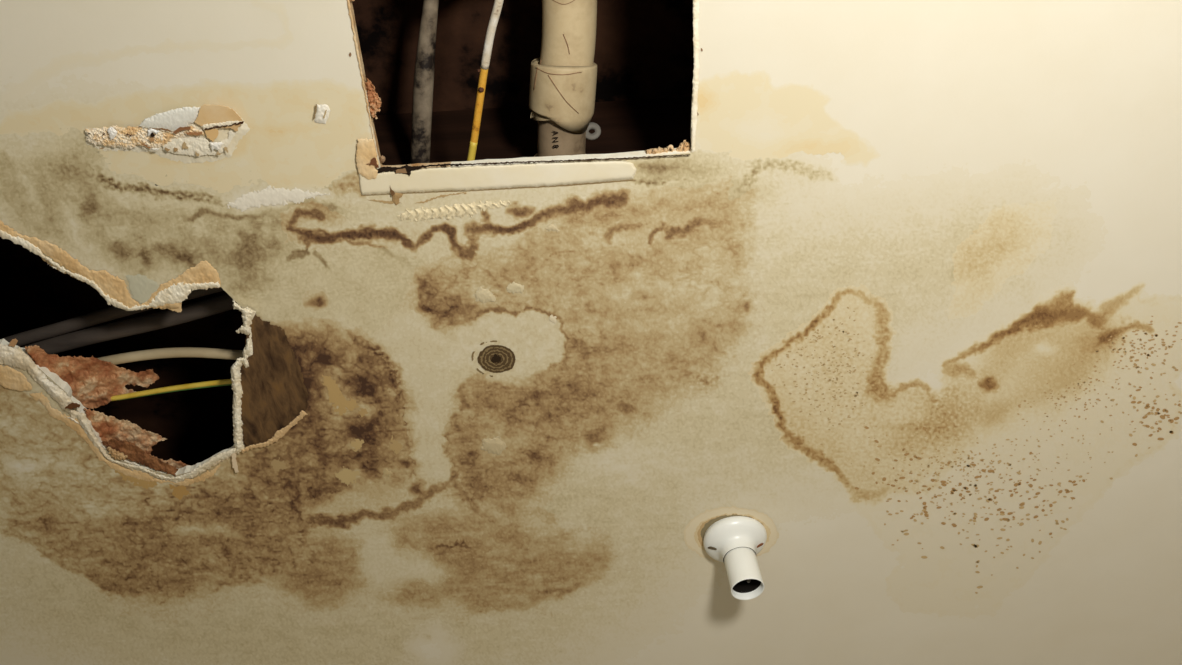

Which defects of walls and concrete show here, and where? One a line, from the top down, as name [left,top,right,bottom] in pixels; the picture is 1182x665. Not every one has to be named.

leakage [0,0,374,193]
peeling [227,185,330,212]
leakage [695,69,881,168]
flaking render [0,343,237,500]
leakage [0,127,1108,665]
leakage [847,281,1182,619]